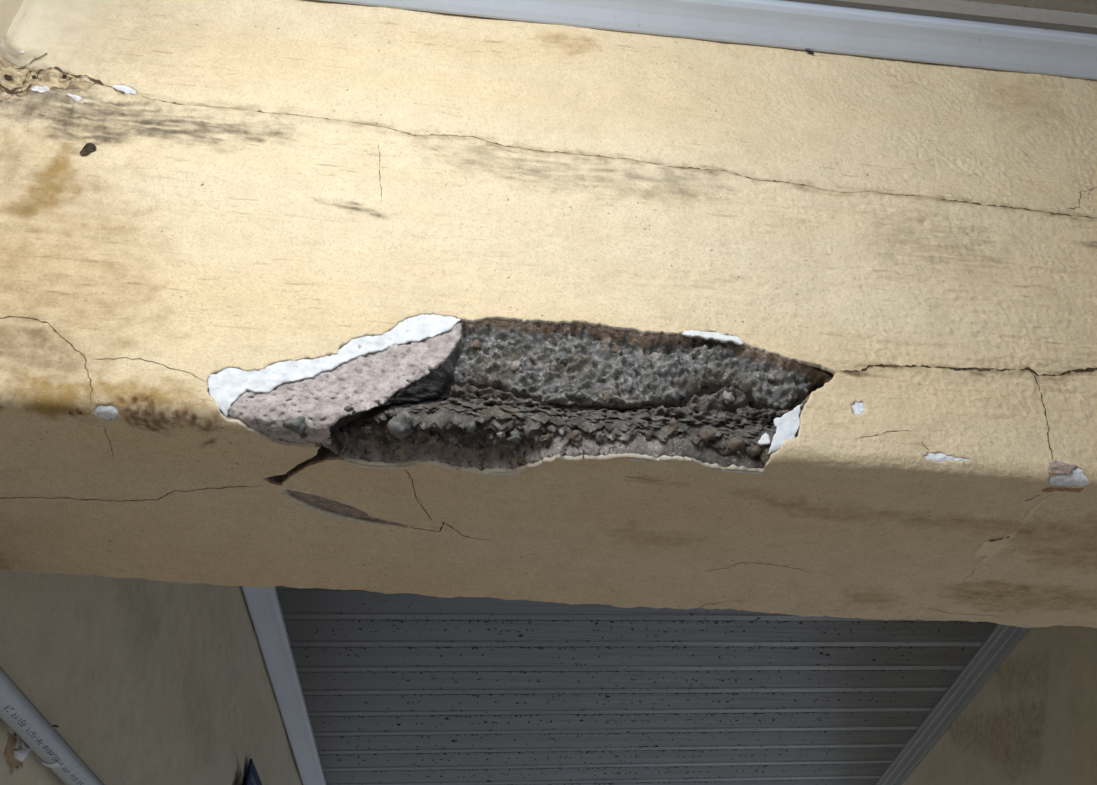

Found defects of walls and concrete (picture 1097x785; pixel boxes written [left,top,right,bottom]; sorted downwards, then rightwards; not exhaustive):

spalling [0,51,136,103]
damp [39,88,248,144]
damp [20,160,66,214]
spalling [80,143,97,155]
crack [365,124,915,198]
crack [941,187,1096,218]
crack [0,316,204,401]
damp [33,380,76,415]
spalling [208,314,833,476]
crack [834,364,1097,459]
crack [2,429,485,540]
peeling [1042,460,1088,492]